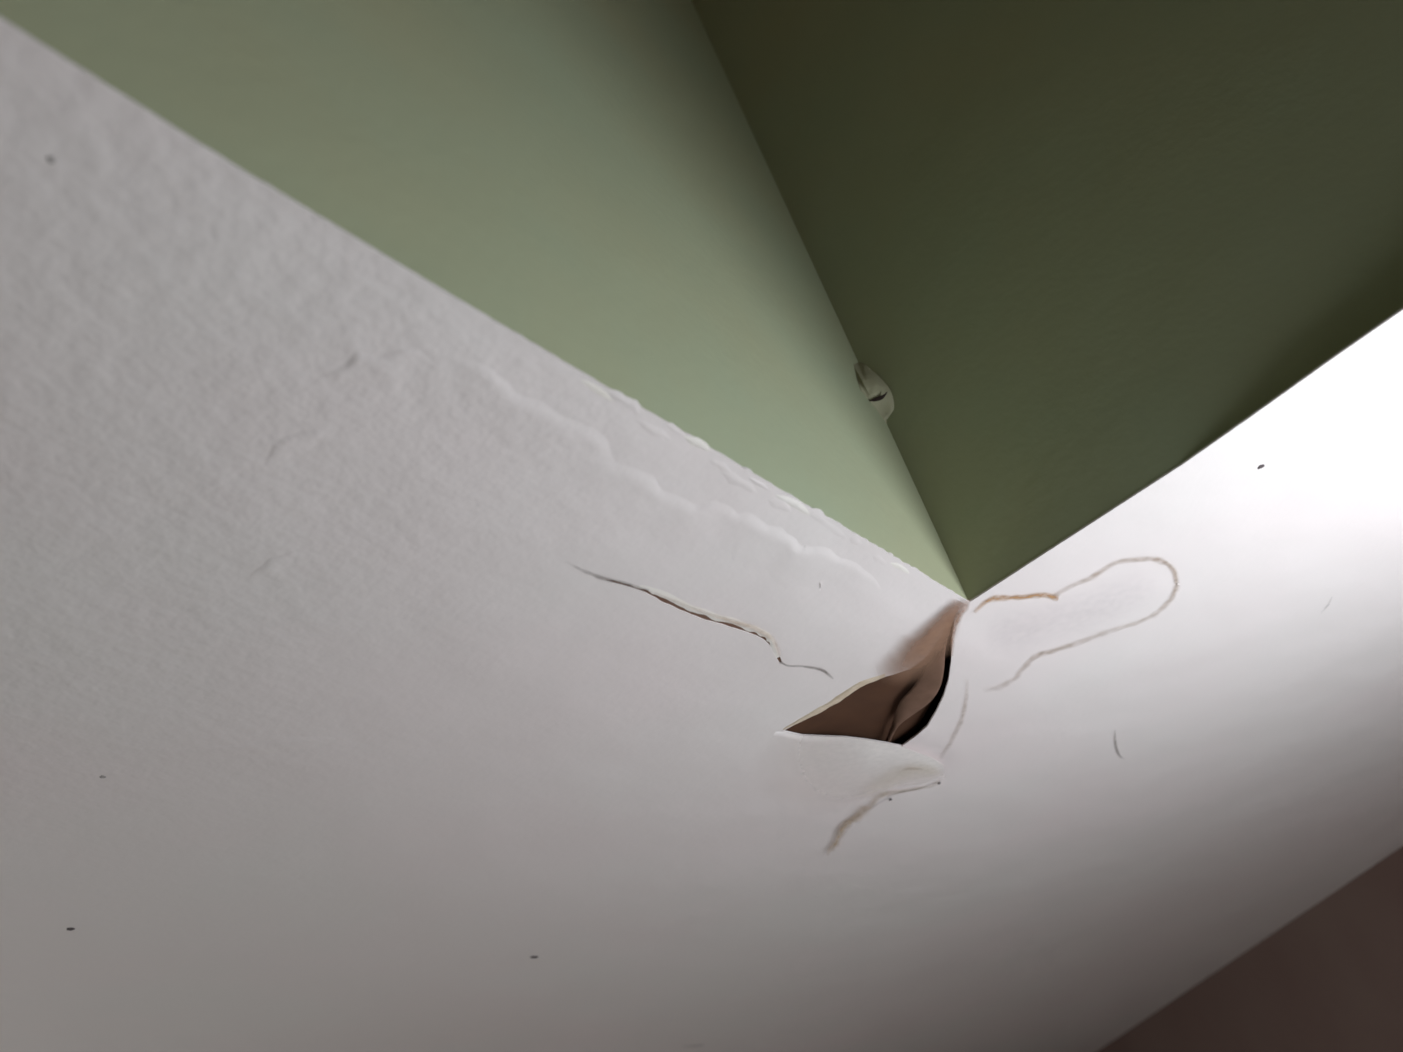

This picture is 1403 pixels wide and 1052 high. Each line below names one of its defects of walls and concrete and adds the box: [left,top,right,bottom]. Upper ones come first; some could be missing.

crack [606,579,783,664]
water stain [985,594,1059,603]
peeling [759,634,952,848]